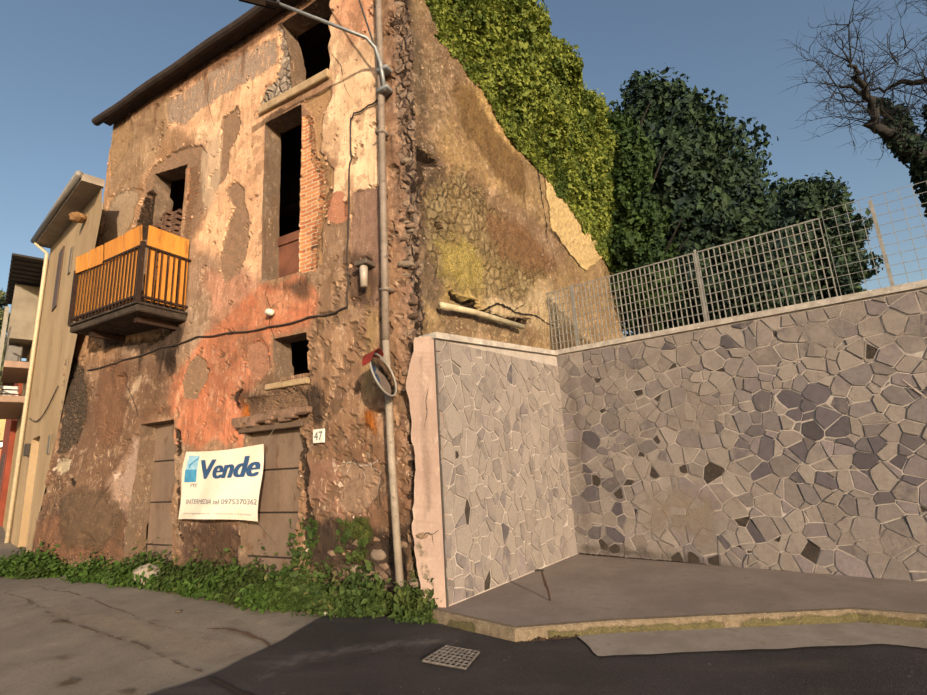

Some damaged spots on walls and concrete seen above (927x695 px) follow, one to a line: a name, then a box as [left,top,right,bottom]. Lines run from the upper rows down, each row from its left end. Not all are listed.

peeling [167,22,292,127]
peeling [101,102,251,282]
flaking render [299,86,381,306]
spalling [392,0,552,355]
flaking render [52,358,88,488]
peeling [300,435,315,552]
spalling [407,414,428,588]